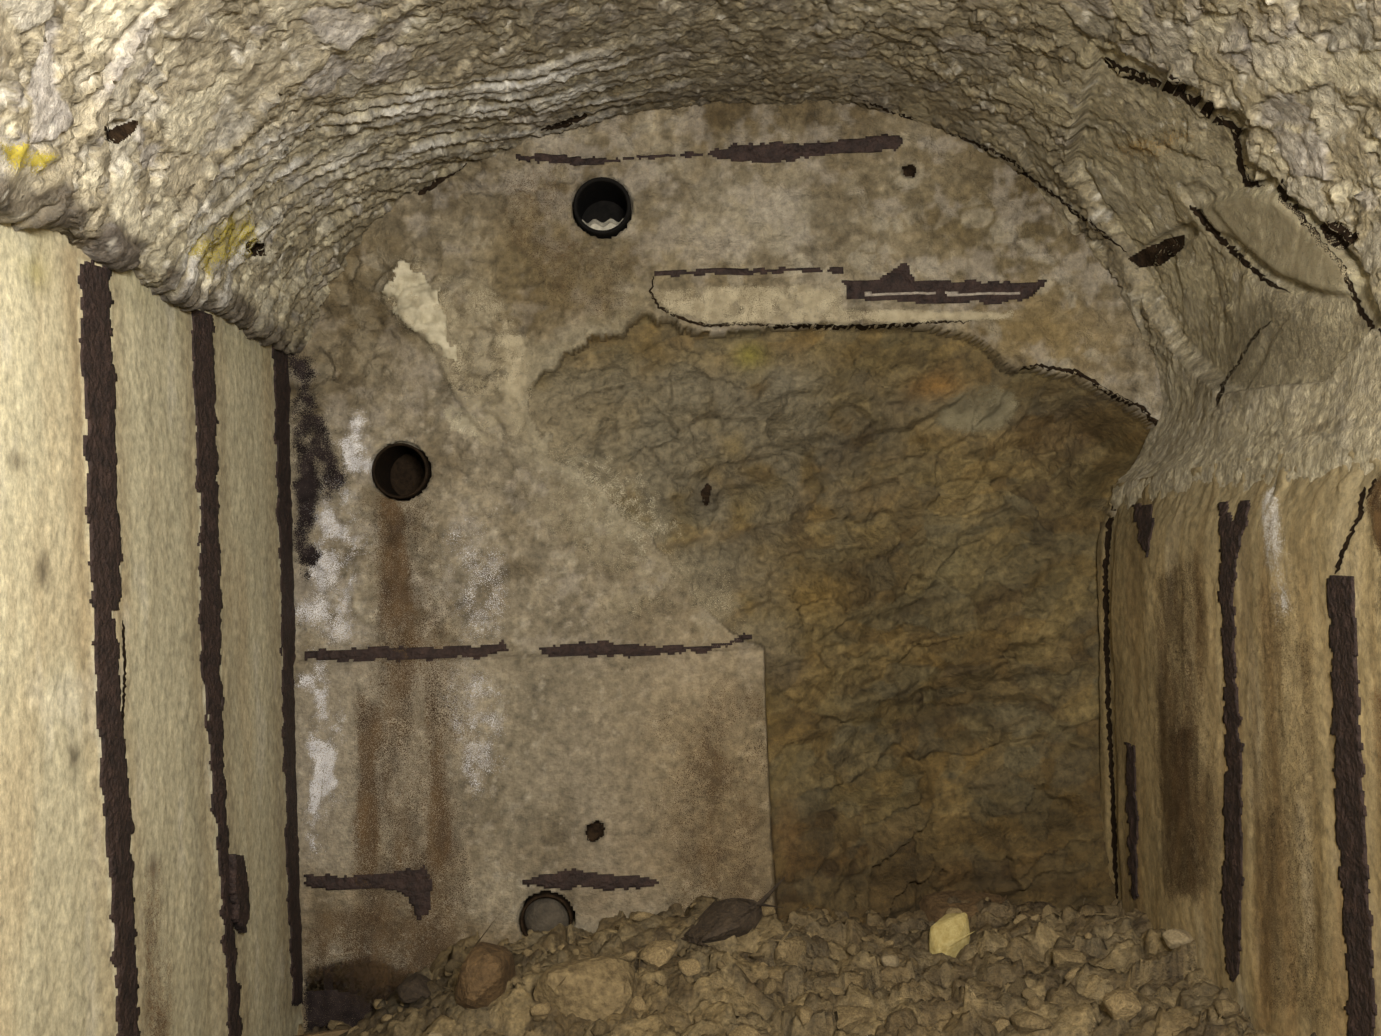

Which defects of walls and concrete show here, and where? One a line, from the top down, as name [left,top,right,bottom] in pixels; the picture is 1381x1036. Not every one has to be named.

crack [1104,57,1381,332]
crack [649,276,971,331]
crack [1189,205,1289,407]
spalling [557,453,682,560]